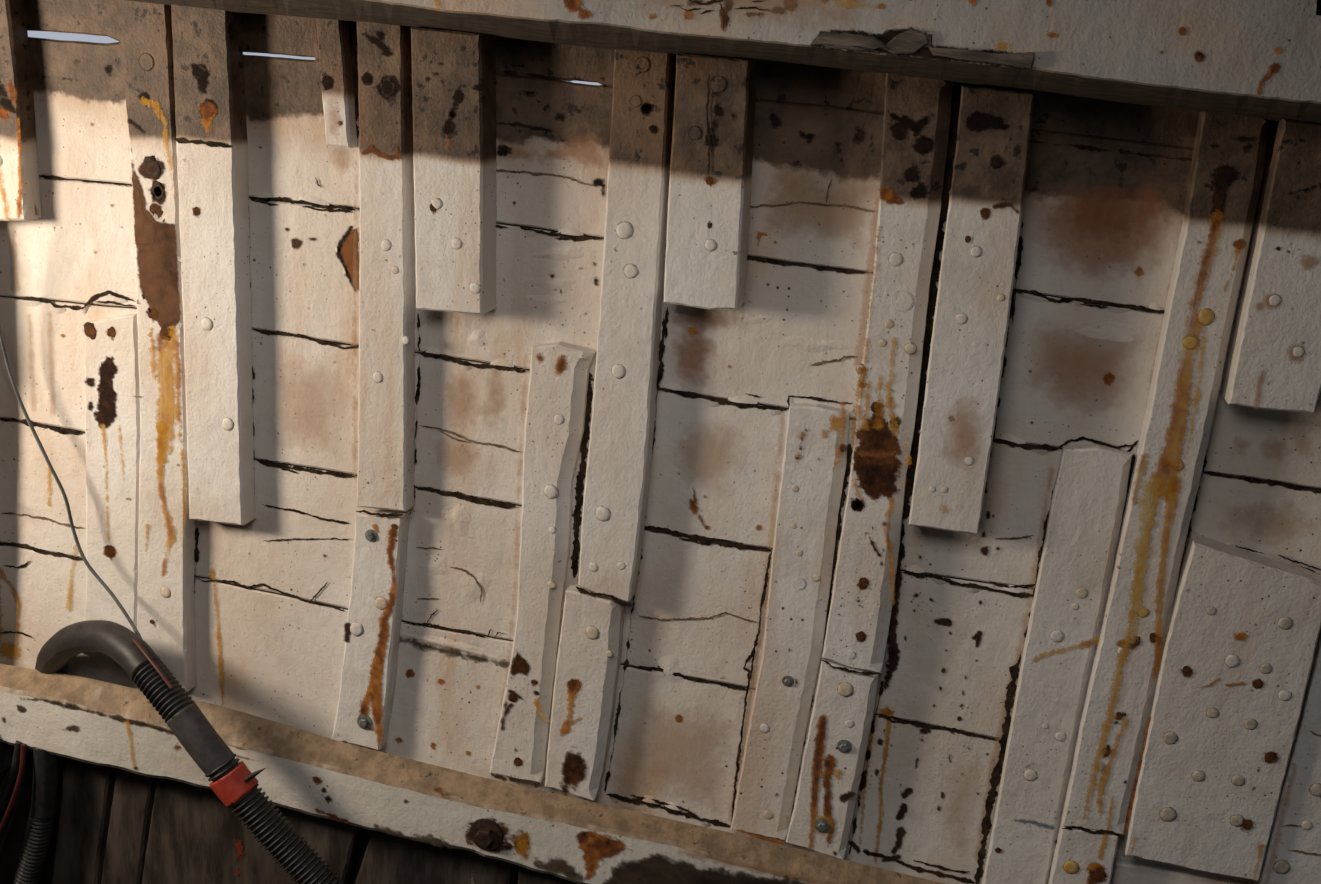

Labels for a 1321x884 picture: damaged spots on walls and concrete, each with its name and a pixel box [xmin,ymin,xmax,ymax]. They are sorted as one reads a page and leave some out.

water stain [0,84,15,113]
water stain [361,30,392,57]
water stain [444,85,481,148]
water stain [1051,192,1157,276]
rust [85,356,124,559]
rust [146,307,187,576]
crack [251,314,525,542]
crack [571,372,772,828]
crack [652,307,857,454]
rust [822,337,911,596]
crack [822,84,1054,884]
rust [1083,163,1246,884]